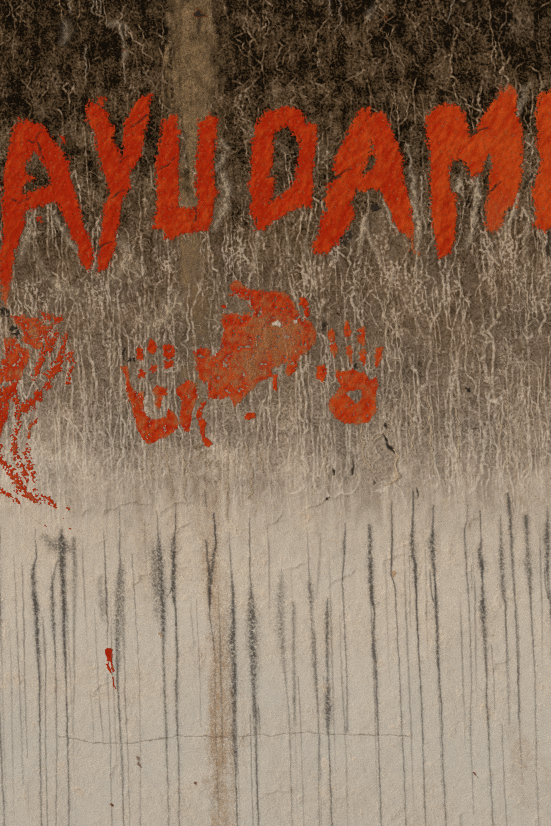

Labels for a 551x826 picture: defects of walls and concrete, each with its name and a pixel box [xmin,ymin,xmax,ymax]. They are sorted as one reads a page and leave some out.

efflorescence [108,245,139,283]
leakage [146,290,185,330]
efflorescence [214,140,231,229]
leakage [357,191,413,451]
leakage [406,144,426,278]
efflorescence [466,178,482,247]
efflorescence [483,193,550,333]
leakage [32,564,40,697]
leakage [53,535,74,678]
leakage [158,528,176,636]
leakage [411,508,419,645]